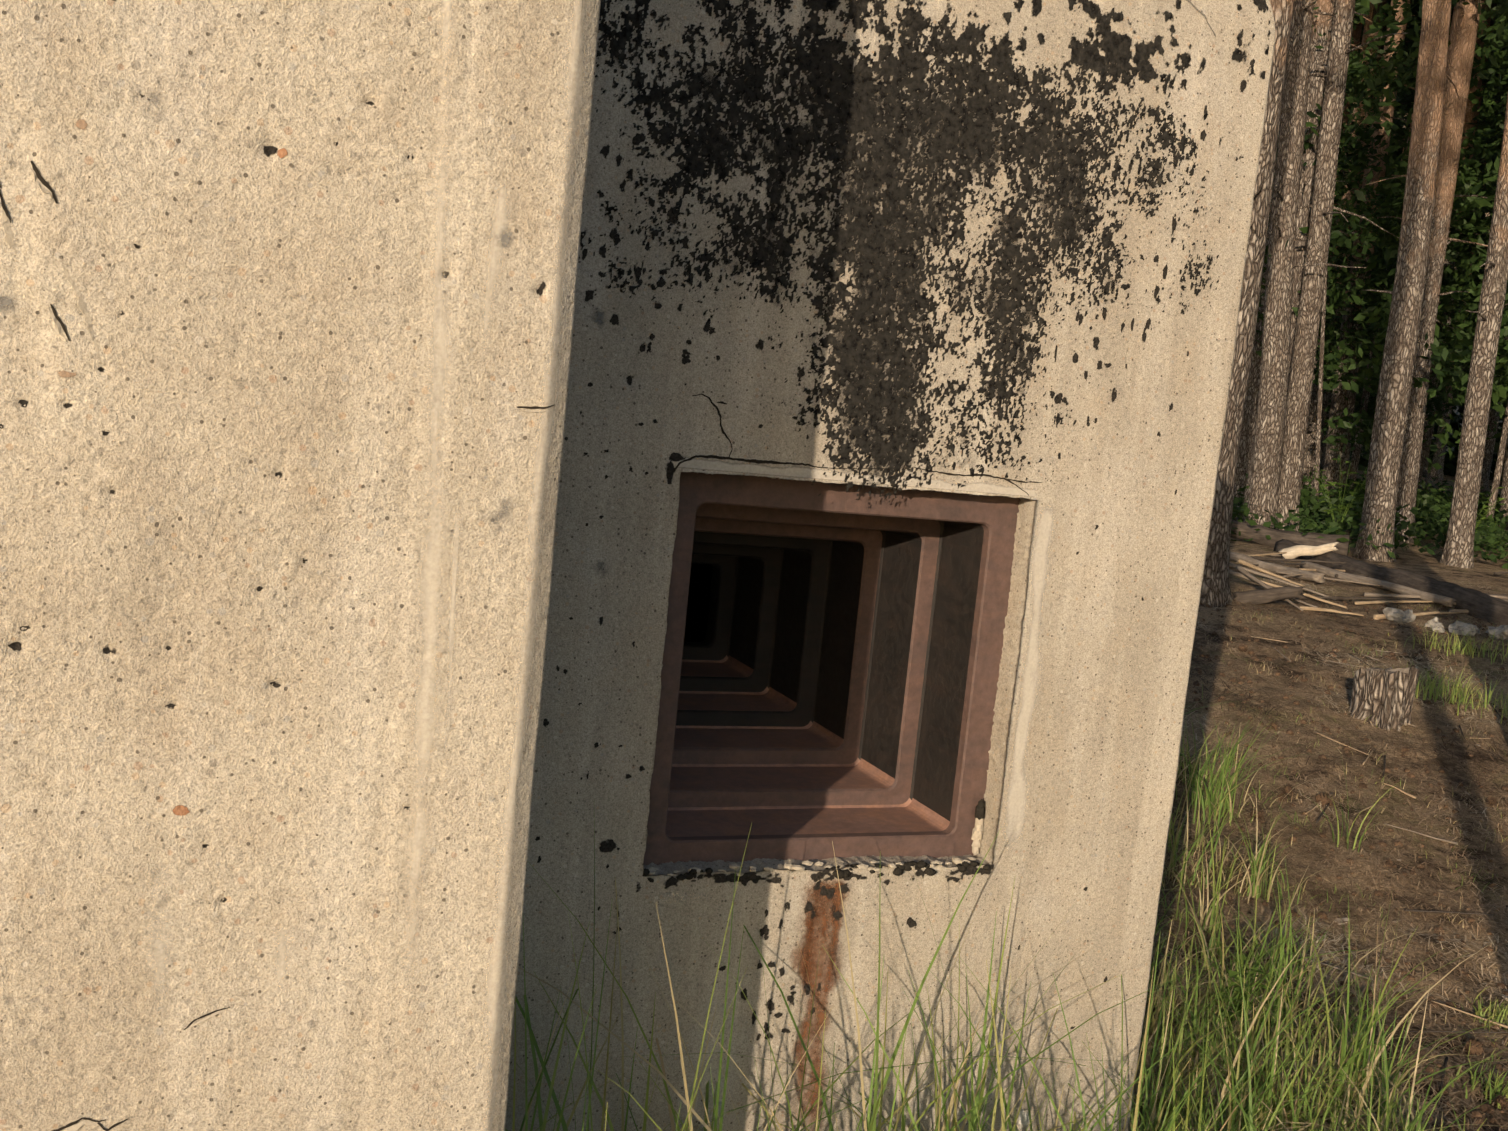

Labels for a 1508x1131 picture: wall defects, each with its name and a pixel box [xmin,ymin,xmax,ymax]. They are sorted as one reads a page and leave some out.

crack [0,160,58,223]
water stain [810,0,1092,502]
crack [48,304,70,341]
crack [667,393,1042,496]
crack [184,1007,230,1030]
corrosion [794,882,845,1122]
crack [52,1118,128,1131]